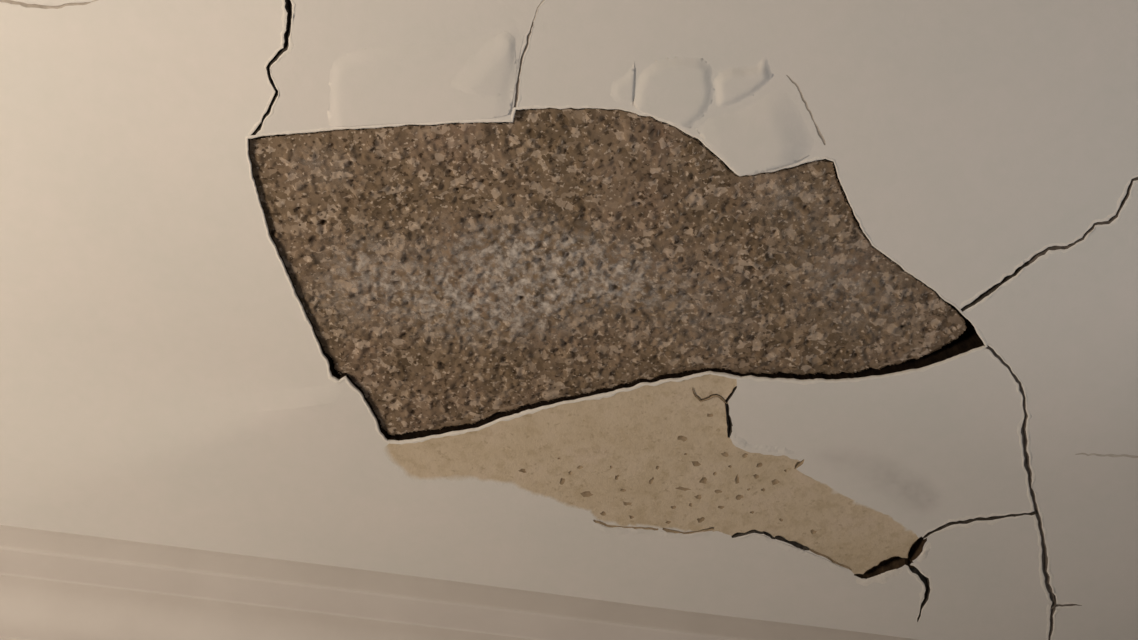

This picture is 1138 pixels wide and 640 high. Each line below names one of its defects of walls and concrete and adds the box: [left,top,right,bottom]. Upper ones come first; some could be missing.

crack [0,0,102,11]
crack [248,0,296,140]
crack [512,0,547,118]
crack [960,175,1138,312]
spalling [245,56,988,586]
crack [907,344,1082,640]